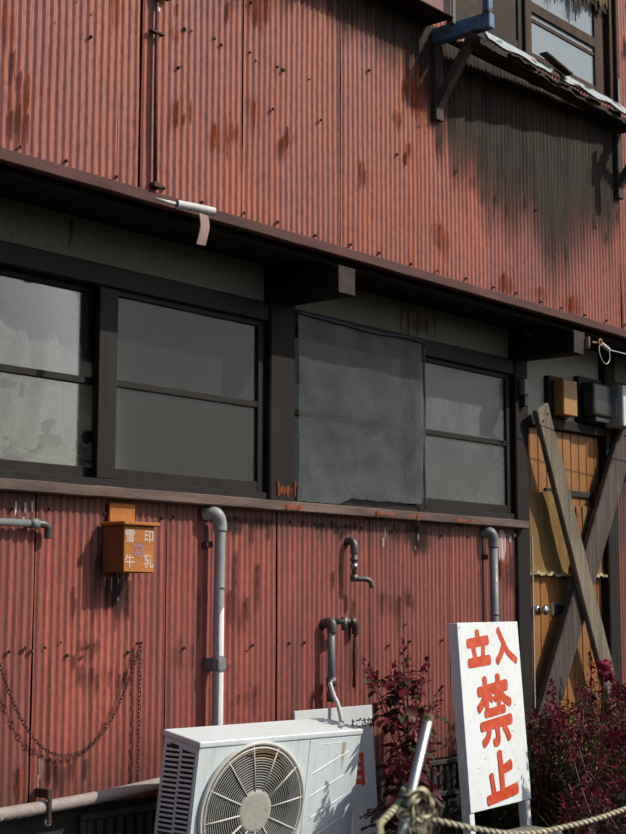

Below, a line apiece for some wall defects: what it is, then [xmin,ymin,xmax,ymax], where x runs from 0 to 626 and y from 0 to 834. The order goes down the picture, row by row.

rust [9,49,31,145]
rust [404,65,429,140]
rust [278,480,301,511]
leakage [95,552,139,624]